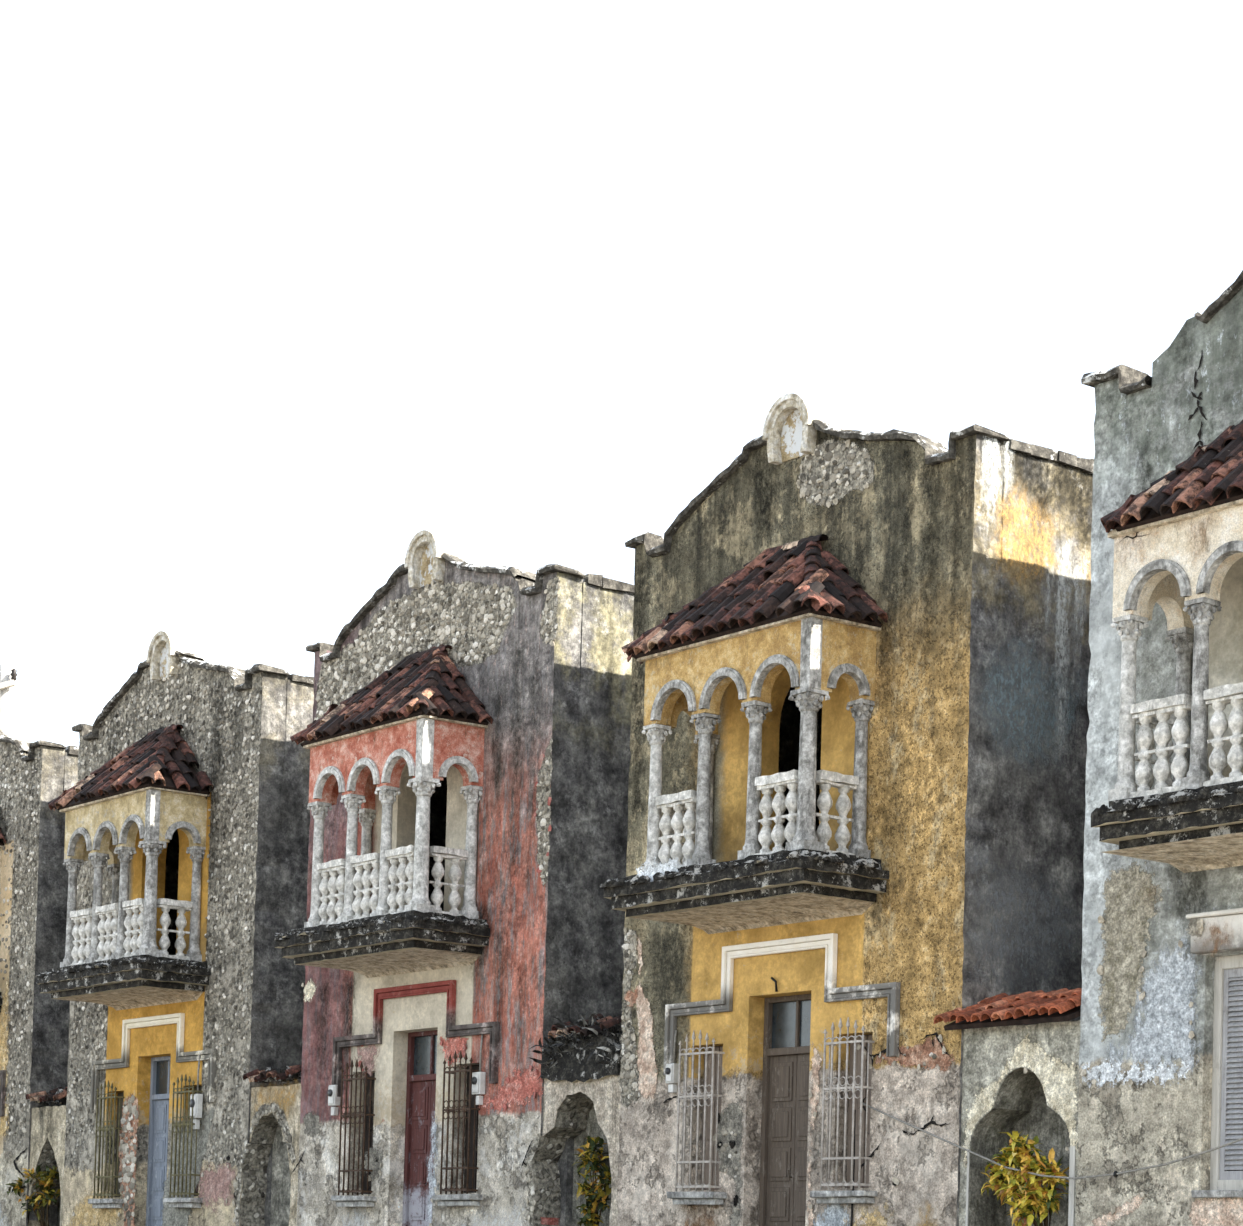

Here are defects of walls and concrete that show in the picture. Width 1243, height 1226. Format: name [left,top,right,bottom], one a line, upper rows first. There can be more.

crack [1188,351,1207,449]
flaking render [796,439,875,508]
damp [982,431,1093,757]
flaking render [534,736,553,886]
flaking render [618,928,658,1108]
flaking render [961,861,1205,1168]
flaking render [66,1093,140,1226]
peeling [477,1062,545,1115]
crack [861,1115,949,1168]